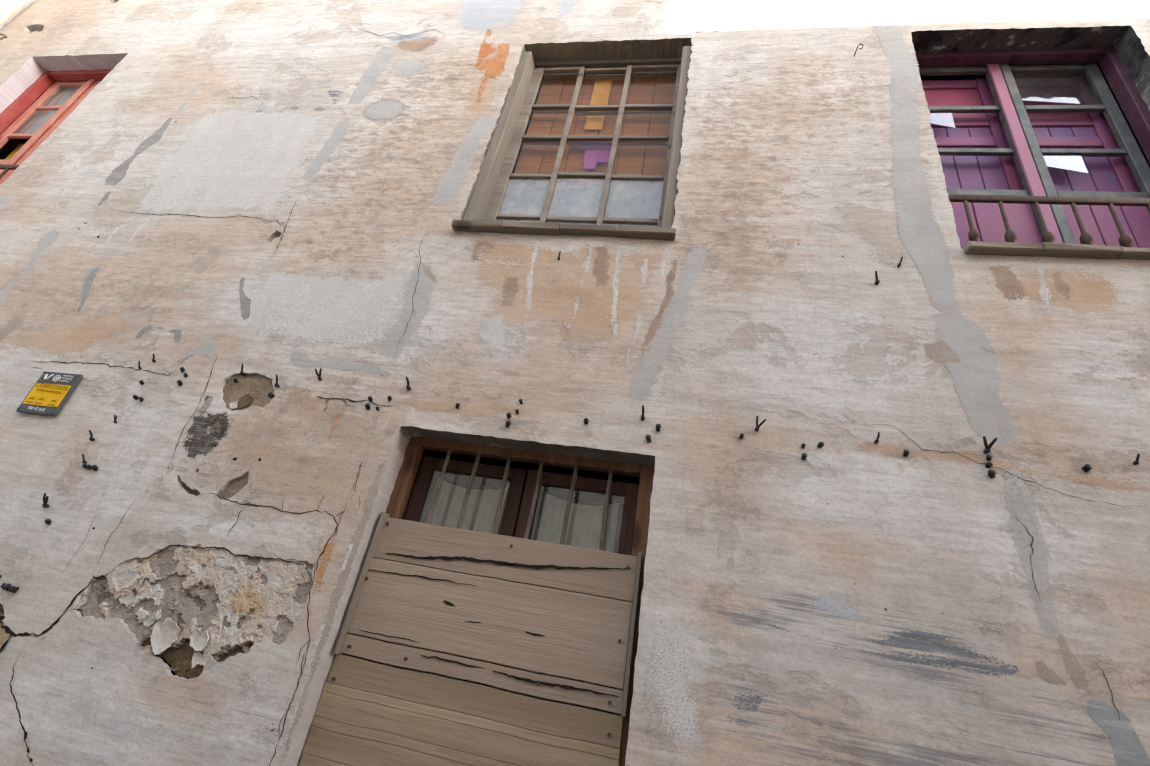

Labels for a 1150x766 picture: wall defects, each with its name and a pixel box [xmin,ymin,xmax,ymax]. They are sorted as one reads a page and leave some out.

rust [466,29,510,115]
spalling [223,374,274,411]
spalling [218,473,249,499]
crack [8,463,362,766]
spalling [74,544,314,679]